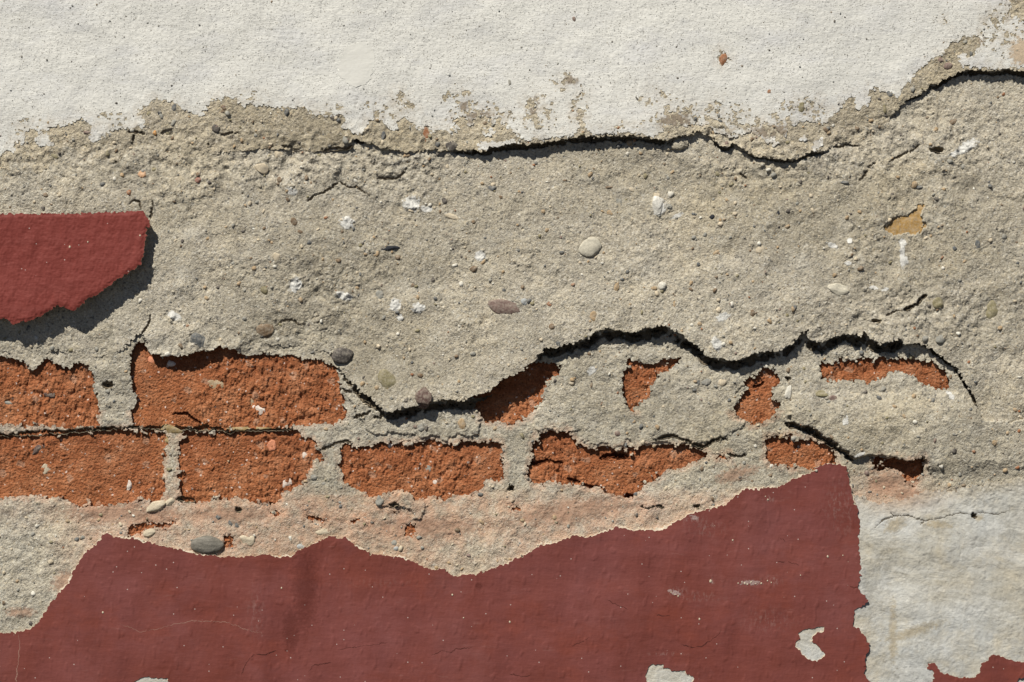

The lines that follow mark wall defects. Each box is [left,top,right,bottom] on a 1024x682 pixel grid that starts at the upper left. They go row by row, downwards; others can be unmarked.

crack [906,70,1024,102]
crack [456,137,673,156]
crack [714,142,920,180]
flaking render [0,69,1024,423]
crack [538,326,977,406]
crack [0,412,292,437]
crack [320,374,493,450]
crack [785,422,853,461]
flaking render [0,320,1024,682]